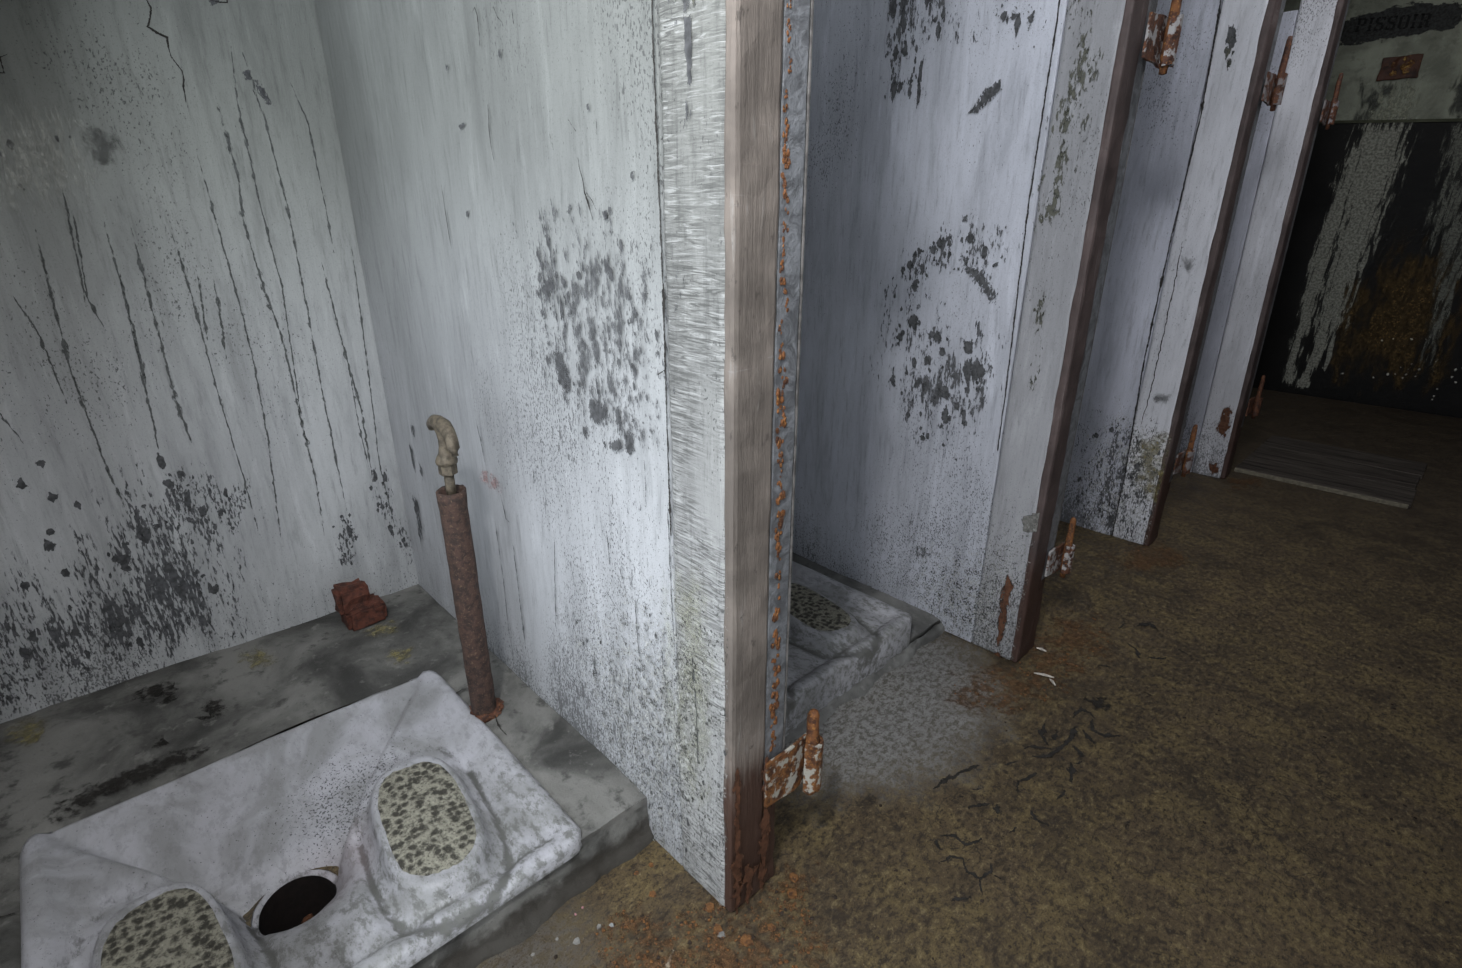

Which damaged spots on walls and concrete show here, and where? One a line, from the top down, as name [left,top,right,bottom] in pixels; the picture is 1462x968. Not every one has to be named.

crack [146,0,186,102]
crack [242,70,272,105]
corrosion [593,0,827,968]
corrosion [947,575,1109,714]